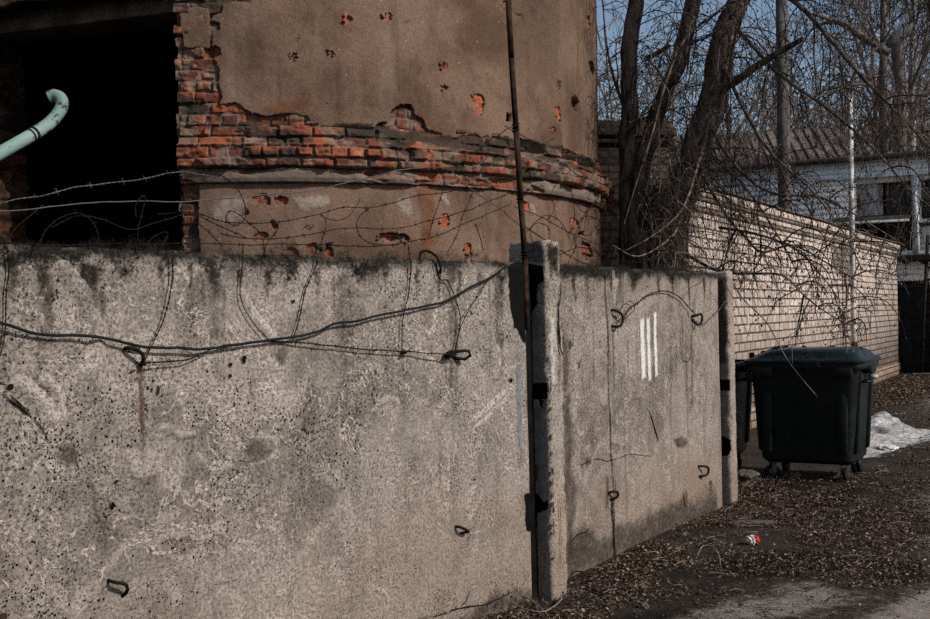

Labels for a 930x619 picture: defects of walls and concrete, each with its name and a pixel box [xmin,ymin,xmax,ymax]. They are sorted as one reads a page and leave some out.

spalling [340,12,355,25]
spalling [173,0,313,169]
spalling [376,103,430,134]
spalling [471,92,487,116]
spalling [237,195,288,216]
leakage [0,236,509,307]